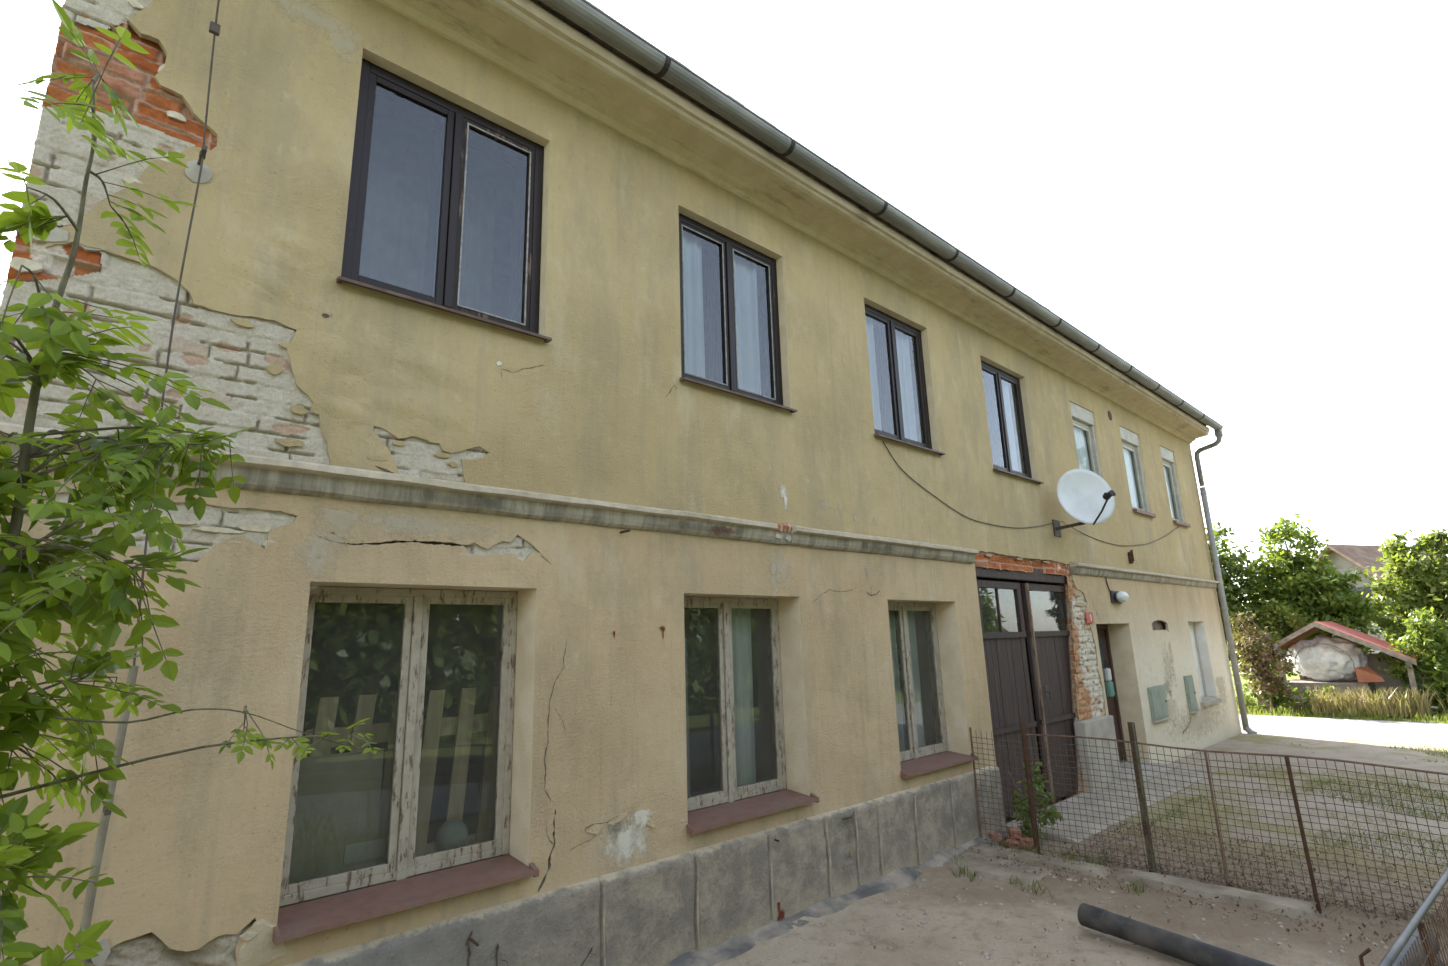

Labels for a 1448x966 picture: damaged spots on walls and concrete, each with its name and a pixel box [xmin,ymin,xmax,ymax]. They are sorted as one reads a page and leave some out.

flaking render [0,0,329,465]
flaking render [367,426,487,482]
spalling [973,552,1105,721]
crack [544,643,610,851]
flaking render [64,918,257,966]
crack [466,930,508,966]